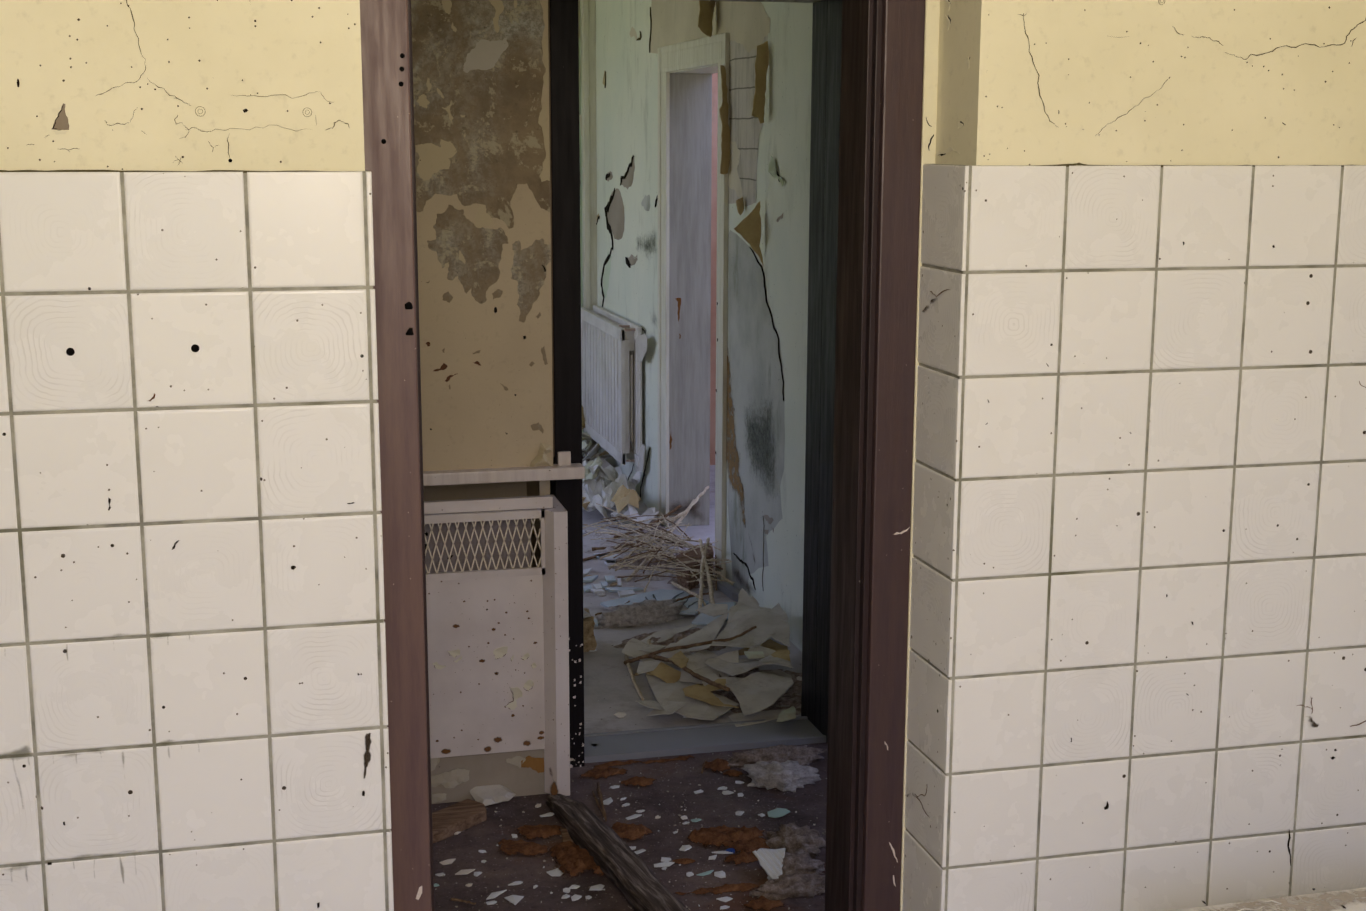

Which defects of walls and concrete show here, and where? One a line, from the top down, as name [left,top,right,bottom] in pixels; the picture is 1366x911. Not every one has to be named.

crack [0,0,358,173]
peeling [411,0,551,322]
peeling [597,155,658,307]
peeling [629,0,784,207]
crack [1019,13,1058,127]
crack [1037,78,1187,167]
crack [1174,19,1366,60]